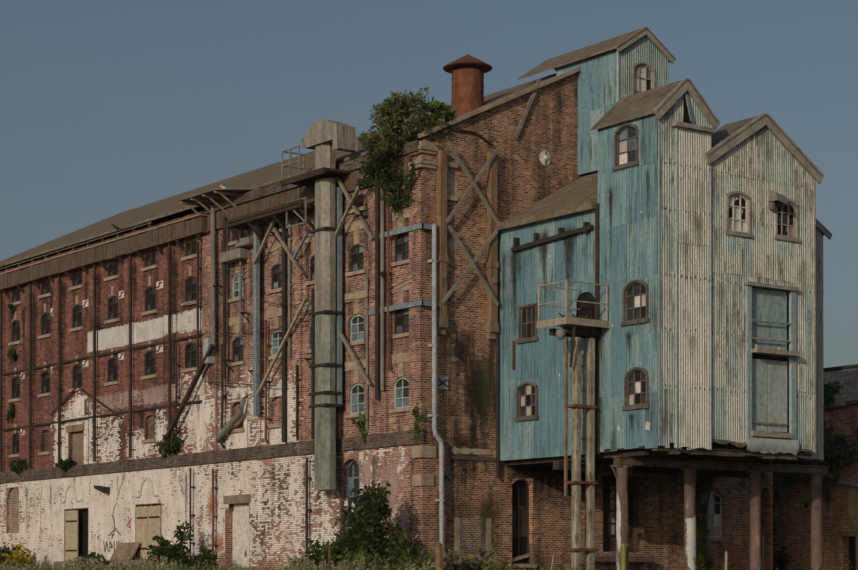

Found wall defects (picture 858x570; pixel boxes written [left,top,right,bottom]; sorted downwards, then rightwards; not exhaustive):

peeling [53,365,304,466]
peeling [0,446,408,570]
peeling [665,500,696,570]